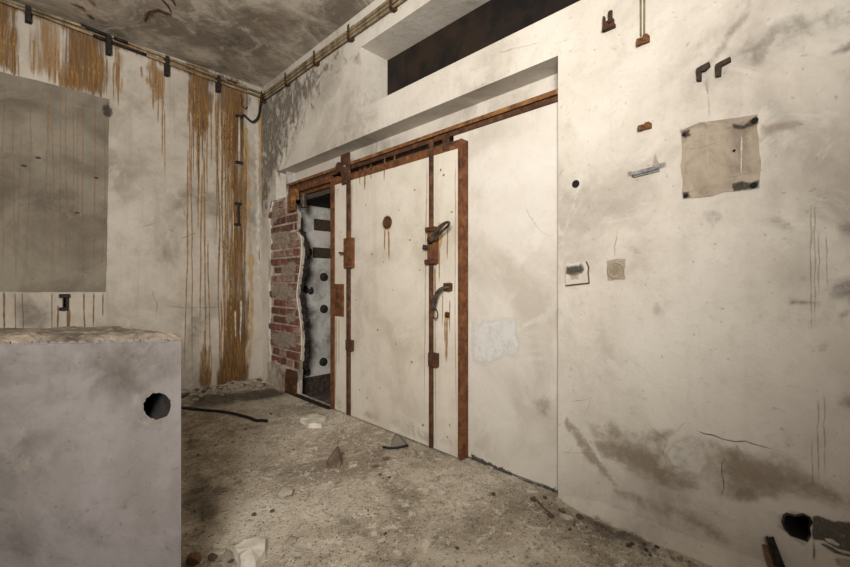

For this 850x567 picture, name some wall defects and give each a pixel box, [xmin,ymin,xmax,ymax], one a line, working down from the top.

rust [0,0,262,387]
water stain [253,64,328,279]
spalling [267,197,310,395]
rust [434,270,450,358]
crack [703,433,766,493]
spalling [781,512,850,557]